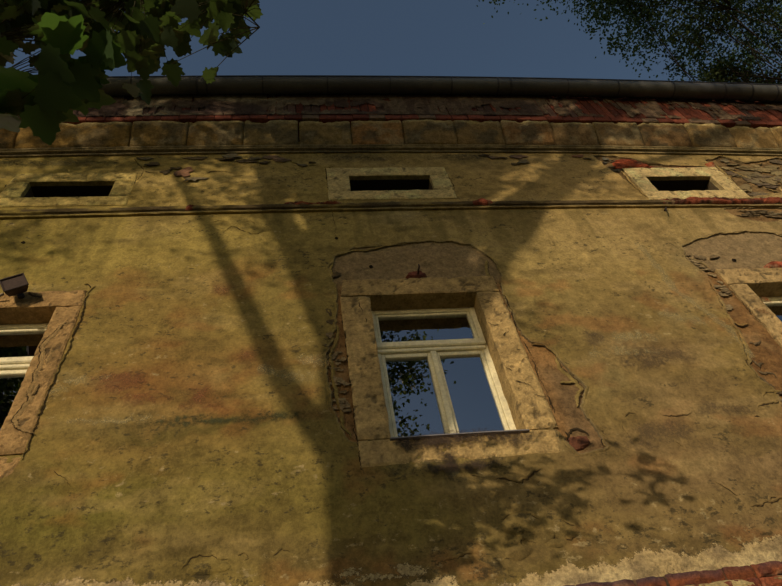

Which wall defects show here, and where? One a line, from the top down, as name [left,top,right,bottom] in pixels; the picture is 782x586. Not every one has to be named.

flaking render [137,153,316,181]
flaking render [322,239,611,457]
flaking render [571,154,782,407]
crack [470,468,543,484]